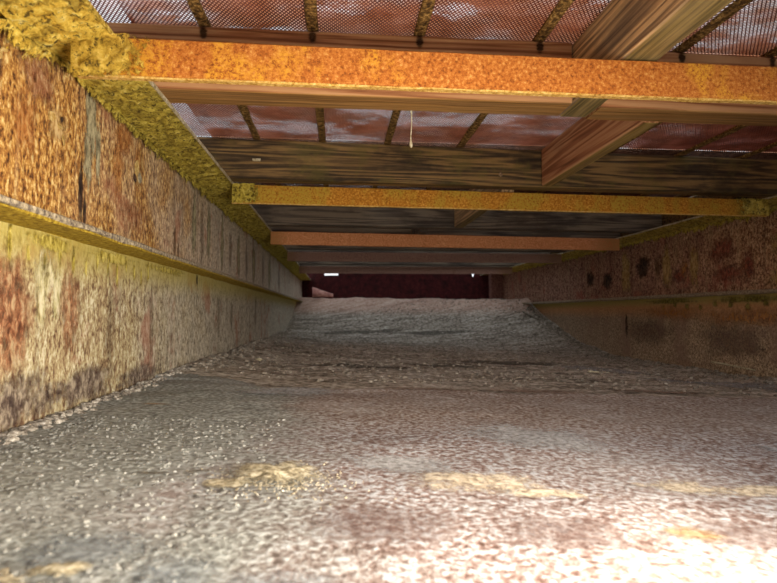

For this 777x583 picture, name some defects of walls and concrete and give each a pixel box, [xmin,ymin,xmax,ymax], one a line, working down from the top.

corrosion [77,74,777,105]
damp [78,91,101,223]
corrosion [232,202,767,217]
corrosion [0,265,27,369]
damp [0,366,108,432]
damp [118,365,156,388]